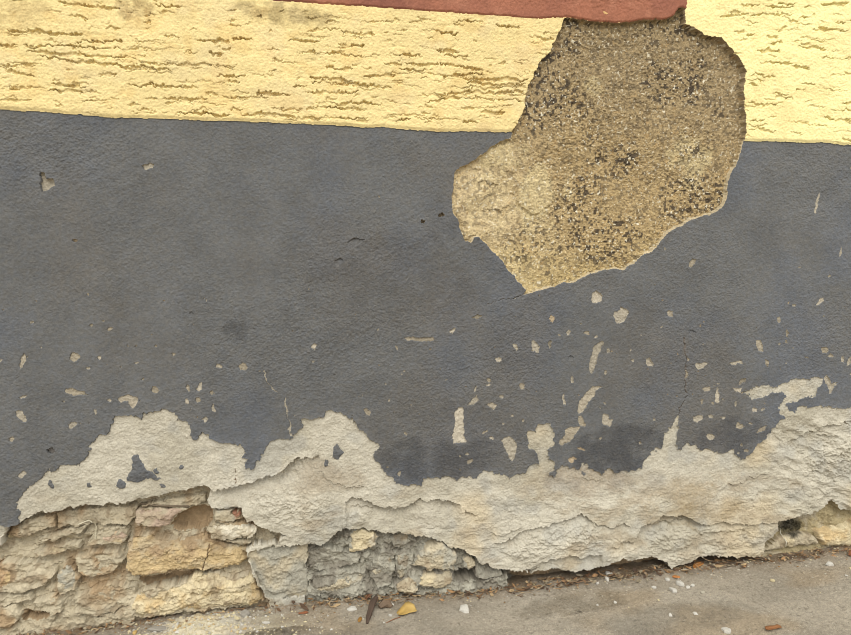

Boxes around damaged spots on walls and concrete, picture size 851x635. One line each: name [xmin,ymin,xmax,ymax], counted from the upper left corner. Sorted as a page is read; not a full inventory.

flaking render [452,7,747,299]
peeling [0,375,851,635]